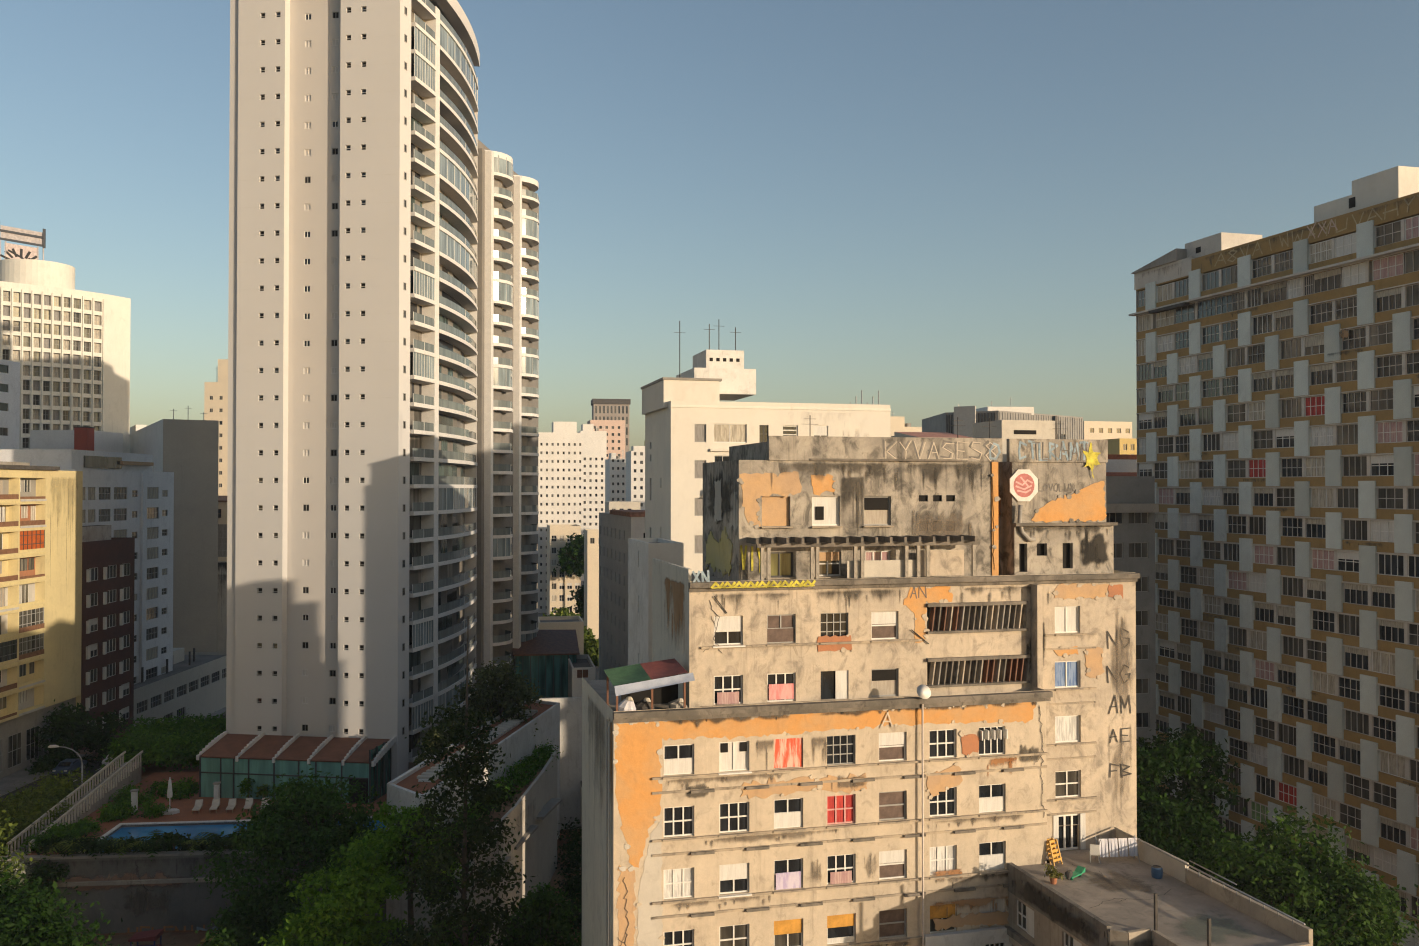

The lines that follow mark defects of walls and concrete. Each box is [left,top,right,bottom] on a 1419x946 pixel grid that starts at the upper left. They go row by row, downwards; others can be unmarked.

peeling [704,471,839,577]
water stain [771,463,982,526]
water stain [913,511,971,536]
water stain [1023,527,1108,565]
peeling [1031,481,1107,523]
peeling [903,586,953,643]
peeling [613,702,1036,946]